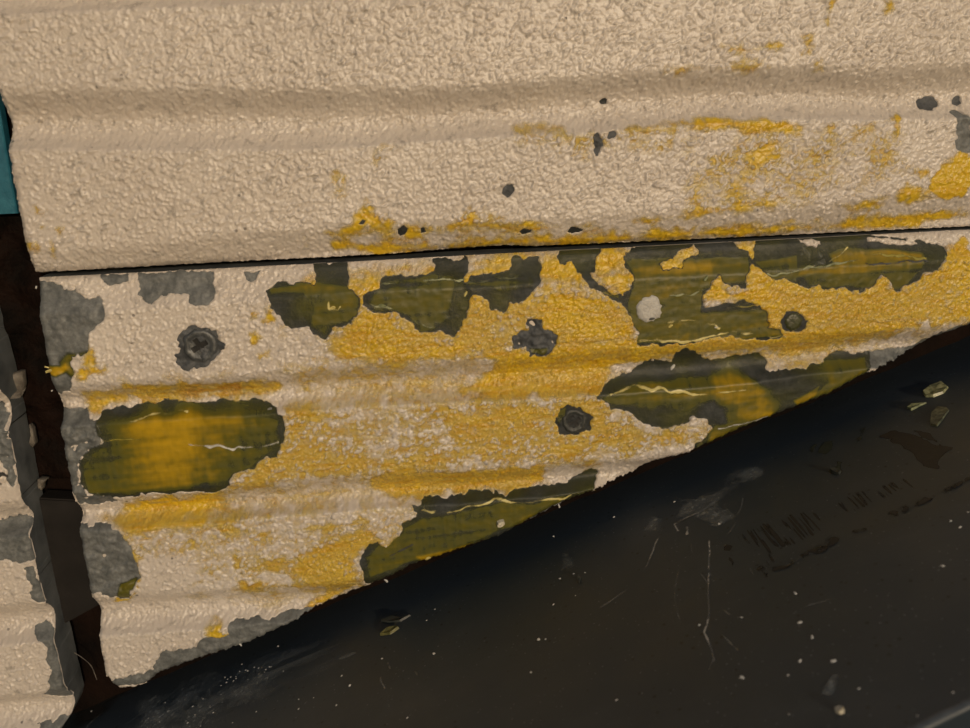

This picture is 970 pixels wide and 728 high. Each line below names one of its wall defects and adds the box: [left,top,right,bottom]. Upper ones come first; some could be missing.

peeling [949,96,970,153]
peeling [35,280,105,394]
peeling [100,270,216,306]
peeling [174,325,225,372]
peeling [266,255,542,340]
peeling [512,319,558,357]
peeling [555,235,970,448]
peeling [61,397,285,505]
peeling [0,514,45,603]
peeling [80,520,141,598]
peeling [359,468,598,584]
peeling [34,619,73,696]